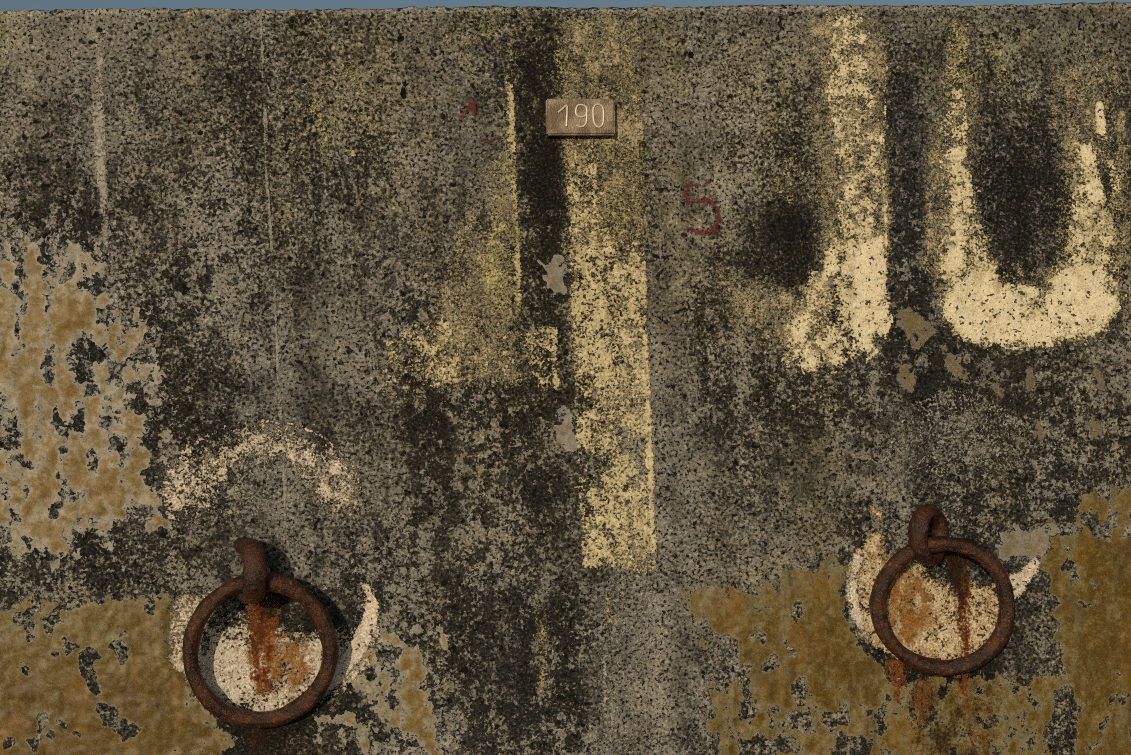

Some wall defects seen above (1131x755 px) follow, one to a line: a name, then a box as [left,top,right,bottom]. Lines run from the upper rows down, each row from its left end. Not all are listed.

water stain [537,254,571,298]
water stain [551,405,578,452]
spalling [878,380,1037,489]
rust [245,591,314,701]
water stain [310,616,458,755]
water stain [530,599,550,696]
rust [888,566,935,647]
spalling [843,504,999,660]
rust [885,659,995,755]
rust [947,551,974,657]
spalling [1009,556,1042,599]